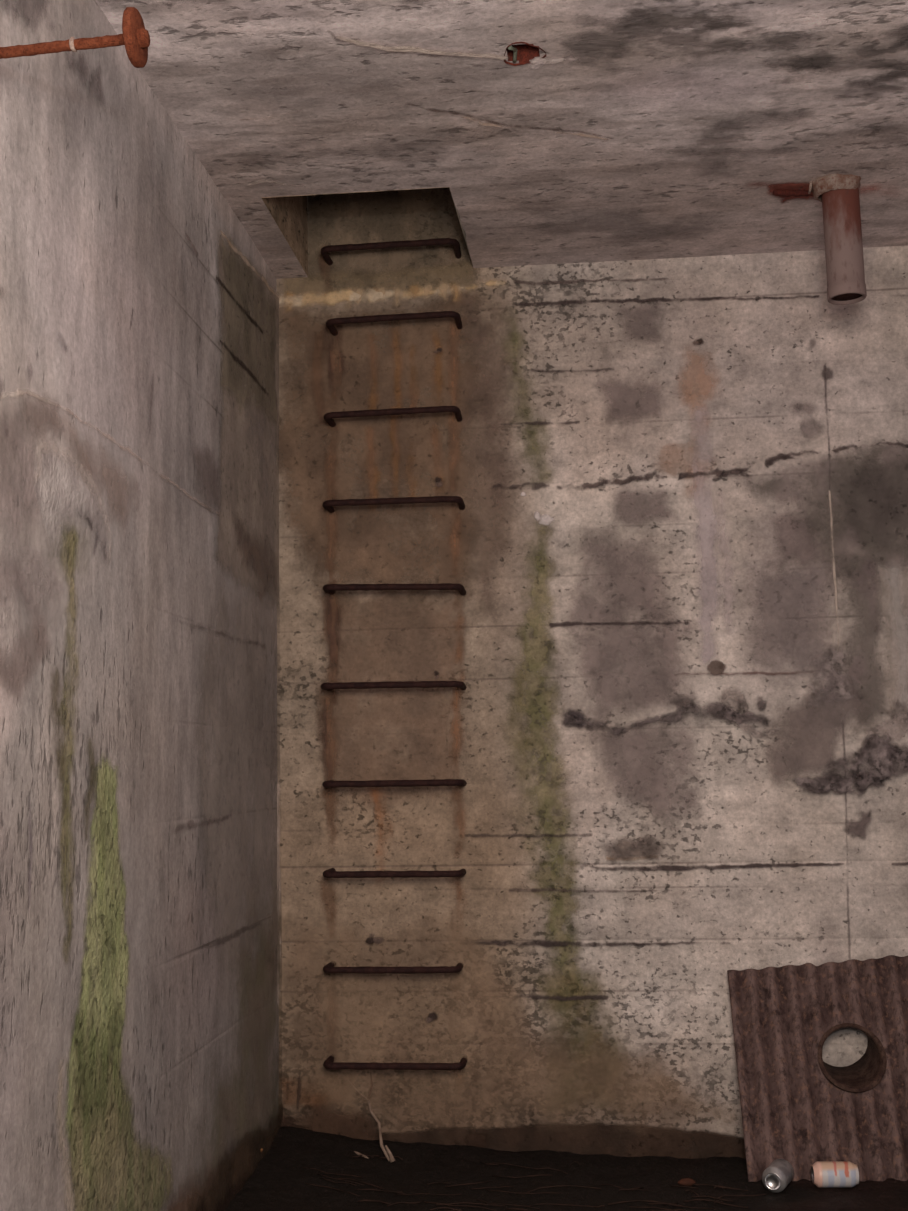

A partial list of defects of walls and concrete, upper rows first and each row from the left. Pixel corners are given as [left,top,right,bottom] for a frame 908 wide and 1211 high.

damp [531,6,908,98]
corrosion [768,178,823,203]
crack [514,278,819,305]
crack [822,365,833,408]
crack [494,442,908,489]
crack [827,491,835,531]
damp [574,546,677,710]
damp [756,445,908,779]
corrosion [322,594,340,834]
spalling [794,704,908,794]
spalling [846,812,871,838]
damp [168,784,746,1211]